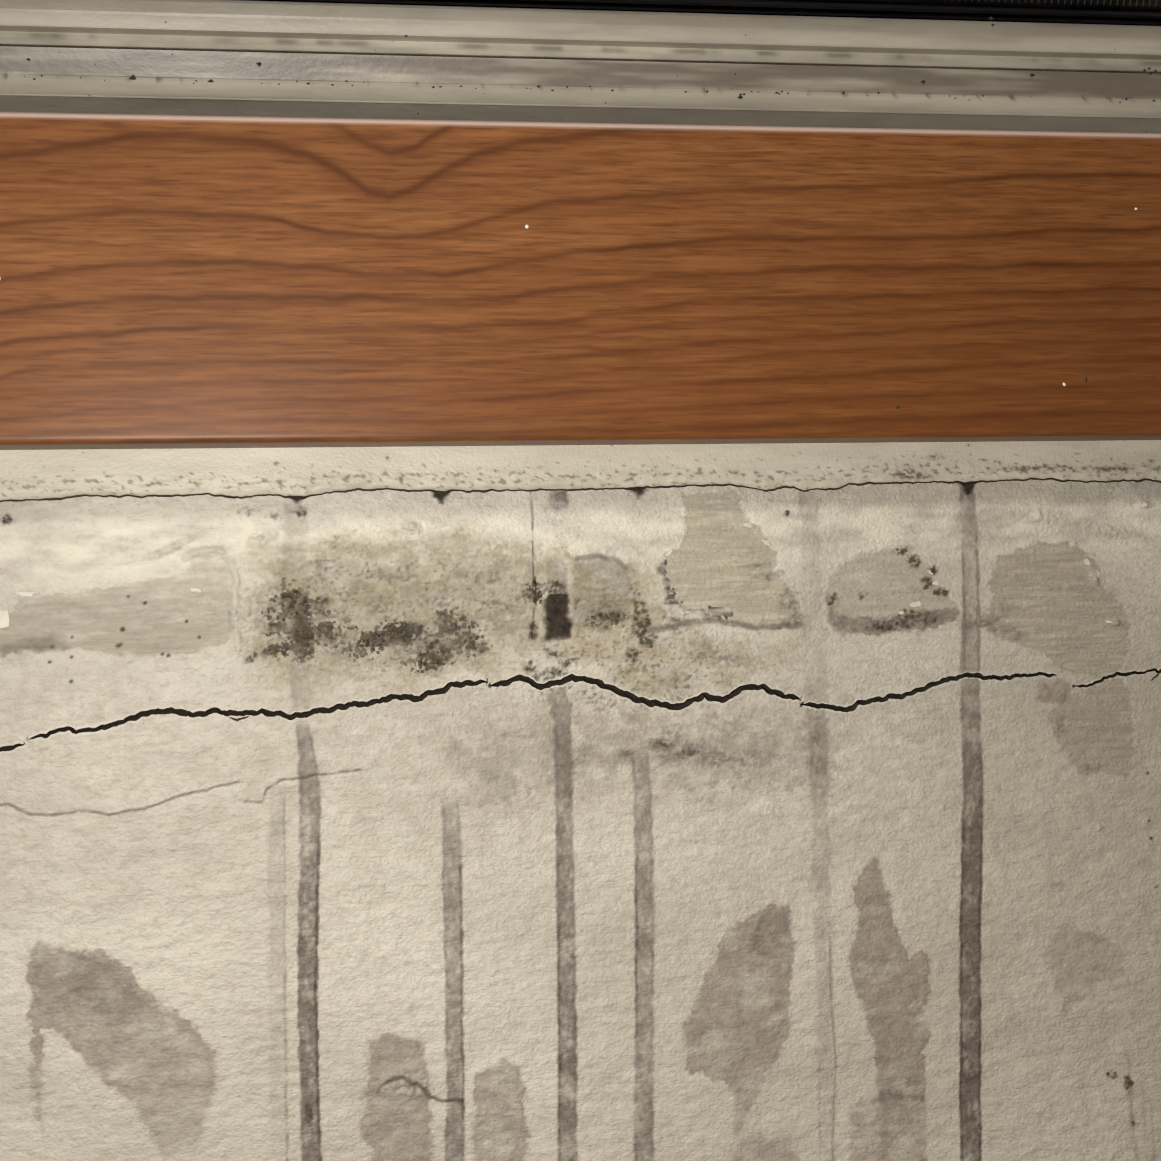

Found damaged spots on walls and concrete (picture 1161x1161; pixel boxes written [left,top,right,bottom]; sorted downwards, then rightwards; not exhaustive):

water stain [246,562,491,671]
crack [0,666,1161,754]
water stain [525,580,660,737]
peeling [649,492,803,632]
peeling [828,548,957,636]
water stain [26,949,215,1092]
water stain [297,740,321,1161]
water stain [361,1033,431,1161]
water stain [556,816,577,1086]
water stain [683,905,794,1091]
water stain [850,860,930,1147]
water stain [959,740,983,1161]